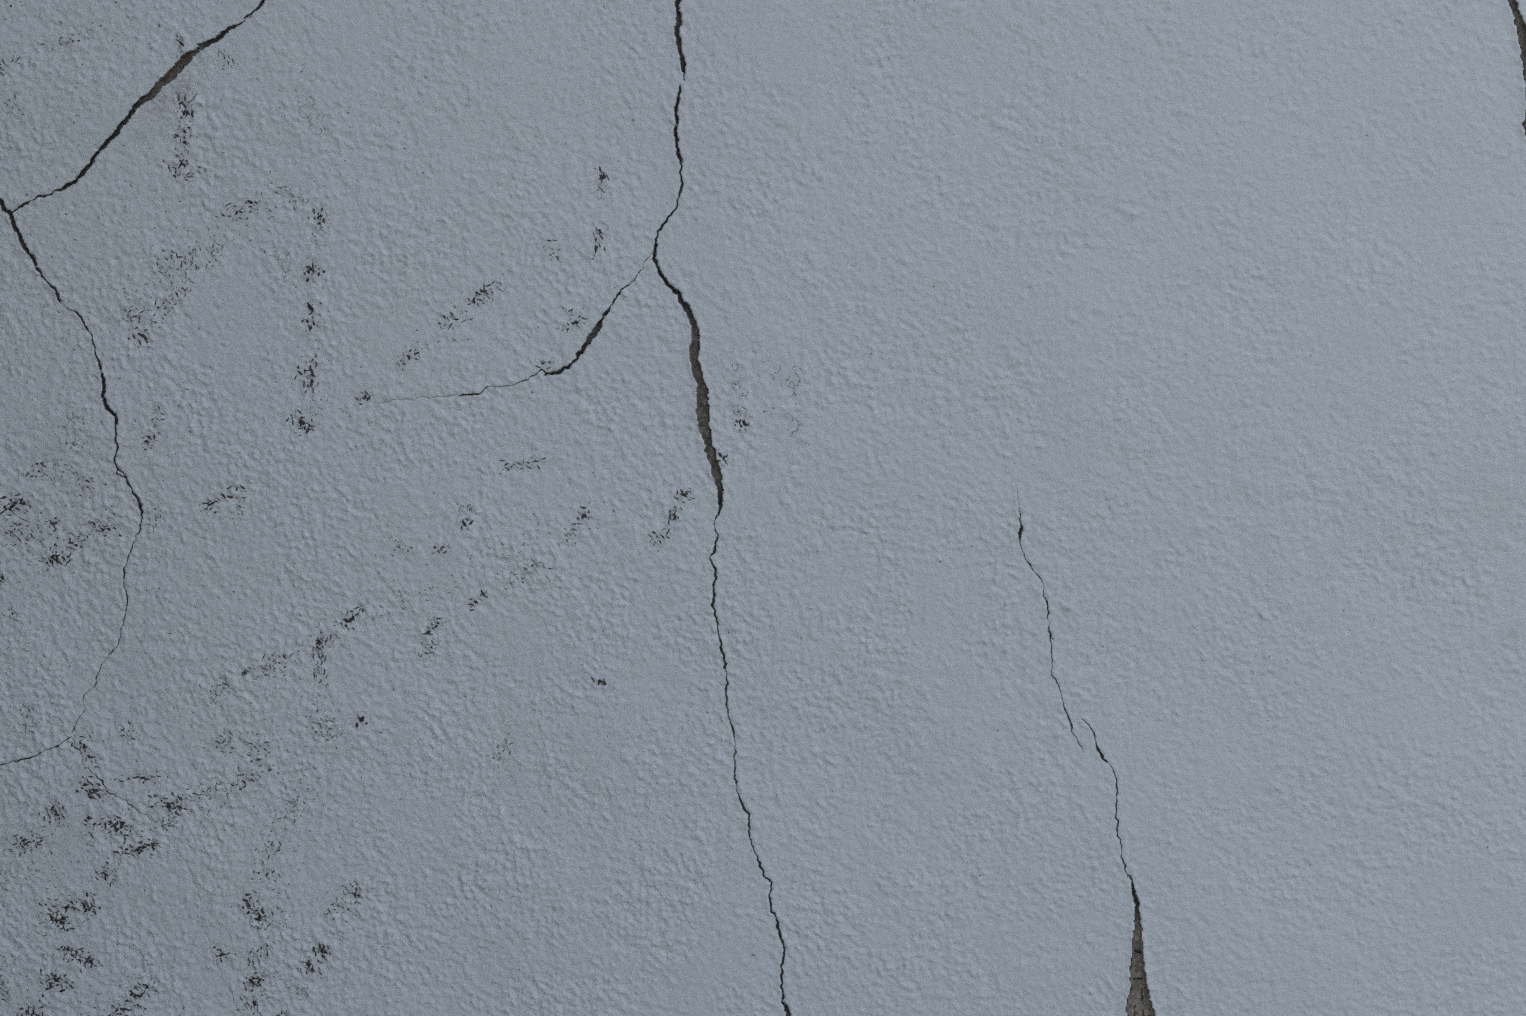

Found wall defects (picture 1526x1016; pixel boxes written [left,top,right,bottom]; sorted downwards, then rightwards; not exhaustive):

crack [0,0,264,1016]
crack [379,0,791,1016]
crack [1016,487,1155,1016]
crack [1509,0,1526,80]